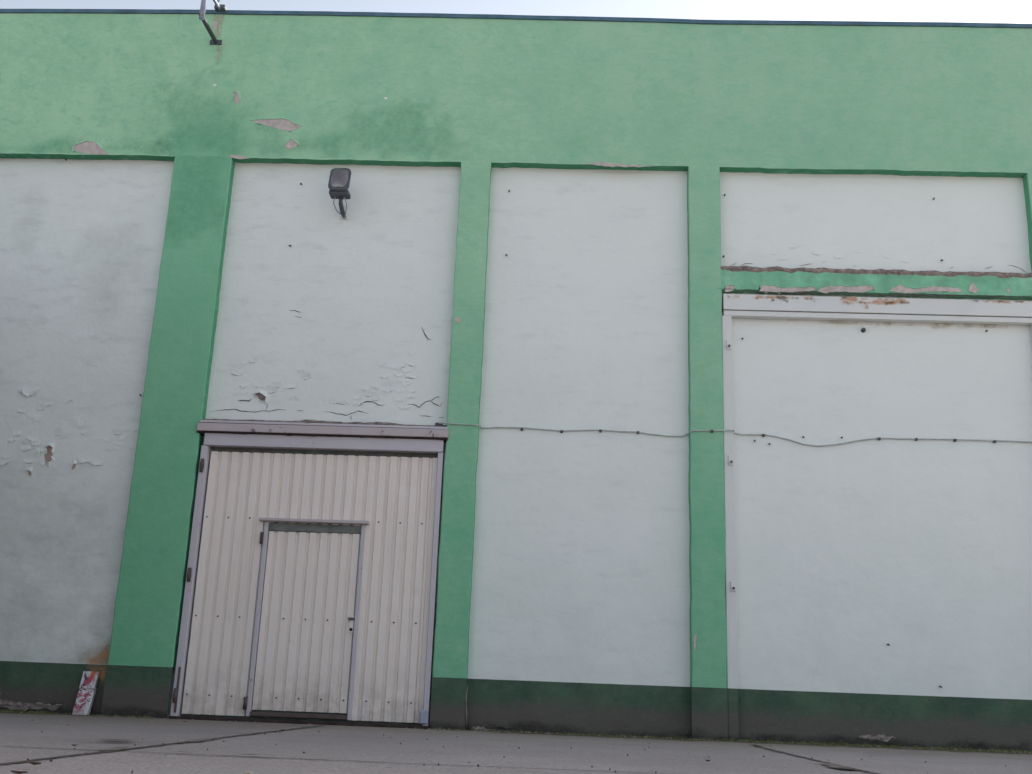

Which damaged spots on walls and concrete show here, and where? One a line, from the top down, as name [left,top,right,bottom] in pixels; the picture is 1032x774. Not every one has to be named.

peeling [72,139,110,155]
peeling [249,117,302,149]
spalling [721,266,1032,294]
peeling [252,389,271,404]
spalling [203,419,447,427]
peeling [26,442,56,476]